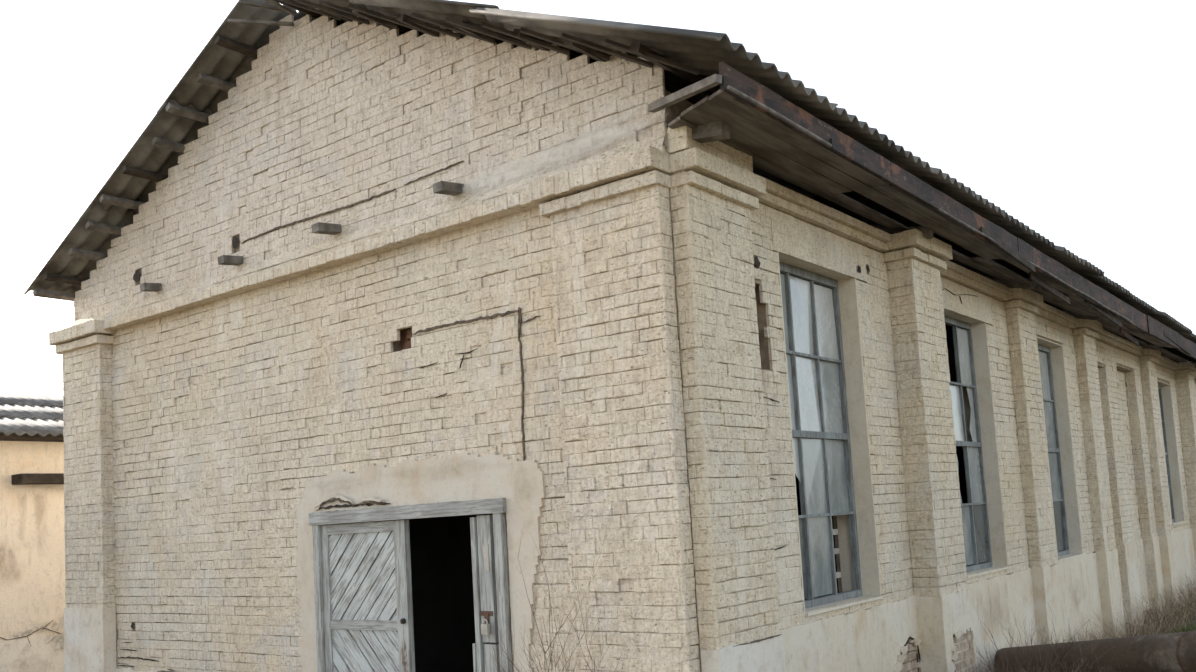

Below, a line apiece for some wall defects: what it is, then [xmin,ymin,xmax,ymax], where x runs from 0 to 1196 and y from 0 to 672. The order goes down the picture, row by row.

crack [242,161,463,243]
crack [414,307,539,461]
flaking render [315,495,390,511]
crack [0,620,61,645]
flaking render [893,636,921,672]
flaking render [952,630,973,672]